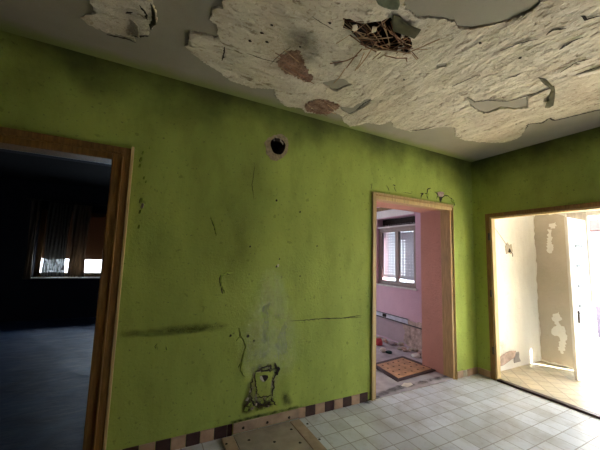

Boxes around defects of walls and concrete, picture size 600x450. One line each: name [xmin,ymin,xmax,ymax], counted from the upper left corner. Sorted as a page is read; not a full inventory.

flaking render [80,0,158,43]
flaking render [185,0,600,143]
spalling [264,134,289,161]
crack [294,314,359,322]
flaking render [534,214,574,368]
crack [236,328,280,408]